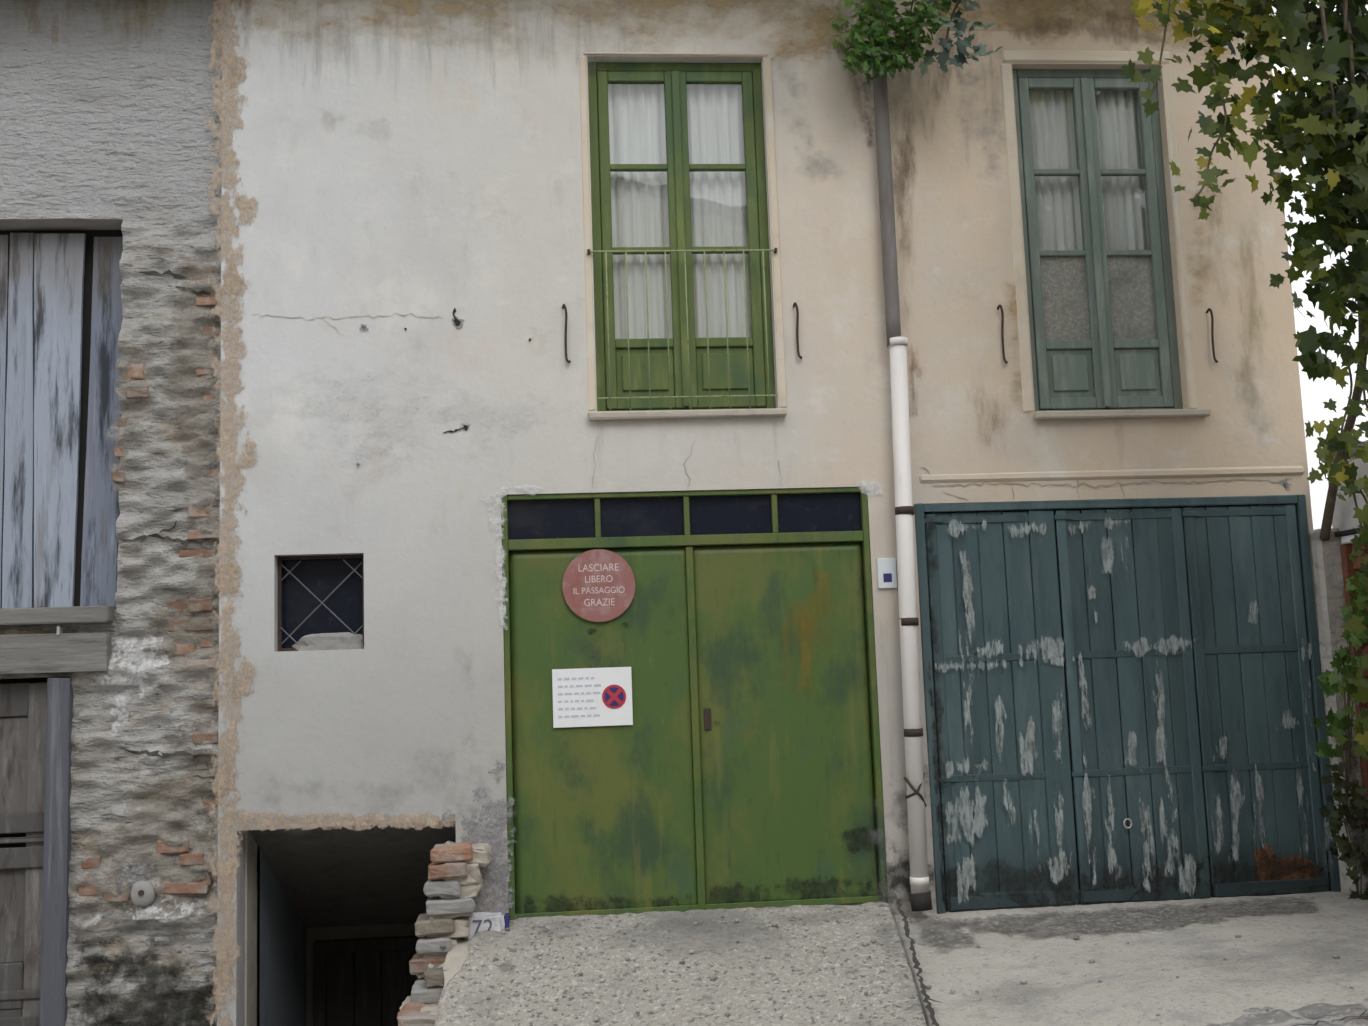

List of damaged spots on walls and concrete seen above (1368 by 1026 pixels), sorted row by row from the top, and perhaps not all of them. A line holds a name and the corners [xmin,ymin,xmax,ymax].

water stain [364,0,503,26]
water stain [561,0,760,32]
water stain [937,0,1209,44]
crack [139,270,214,308]
crack [254,313,442,335]
crack [120,520,211,544]
flaking render [74,0,515,1026]
spalling [909,518,1333,950]
crack [118,748,217,779]
water stain [74,935,216,1026]